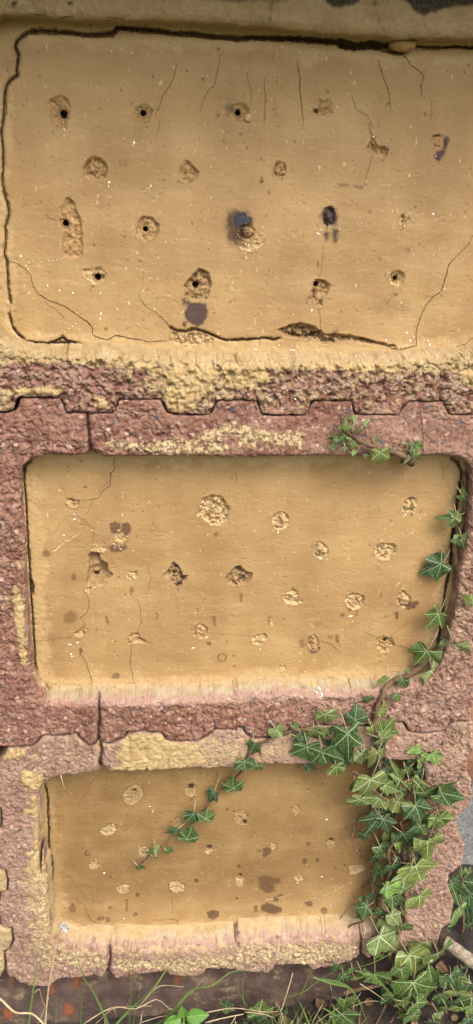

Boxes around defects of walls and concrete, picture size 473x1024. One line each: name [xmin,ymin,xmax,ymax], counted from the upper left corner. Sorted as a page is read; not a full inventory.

crack [0,14,473,350]
leakage [182,299,207,326]
spalling [274,321,397,348]
crack [55,414,115,538]
crack [24,461,104,809]